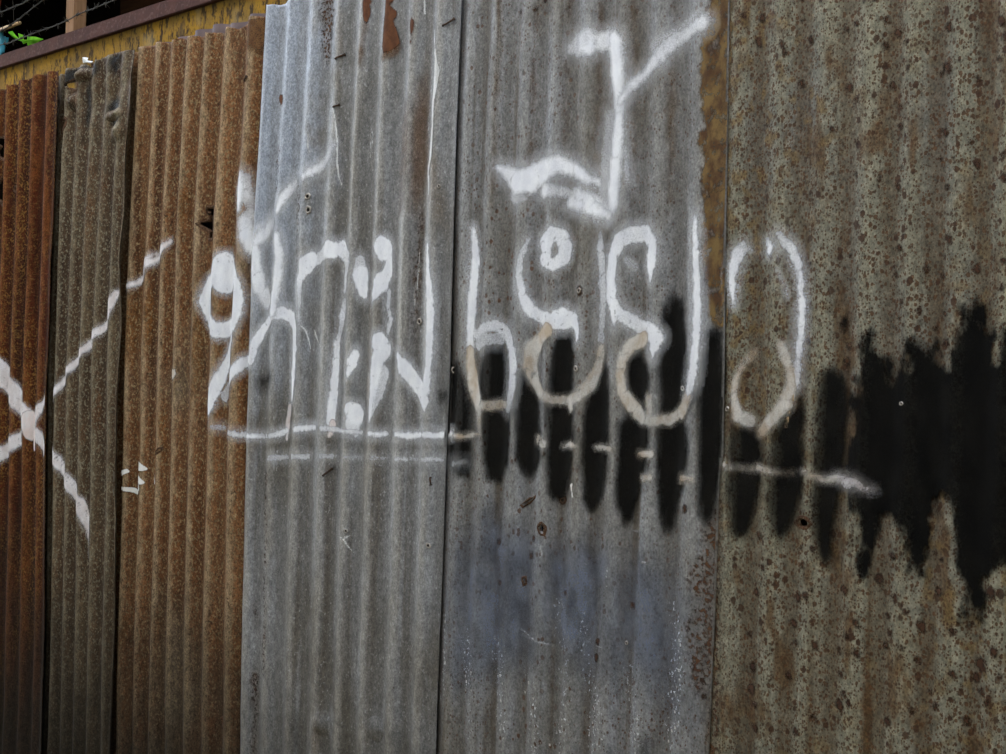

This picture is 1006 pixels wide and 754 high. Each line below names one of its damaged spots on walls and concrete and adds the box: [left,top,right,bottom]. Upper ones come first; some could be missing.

corrosion [362,0,372,23]
corrosion [382,0,414,58]
corrosion [882,15,908,49]
corrosion [697,0,746,328]
corrosion [686,501,722,754]
corrosion [891,593,926,633]
corrosion [836,690,850,712]
corrosion [971,647,998,707]